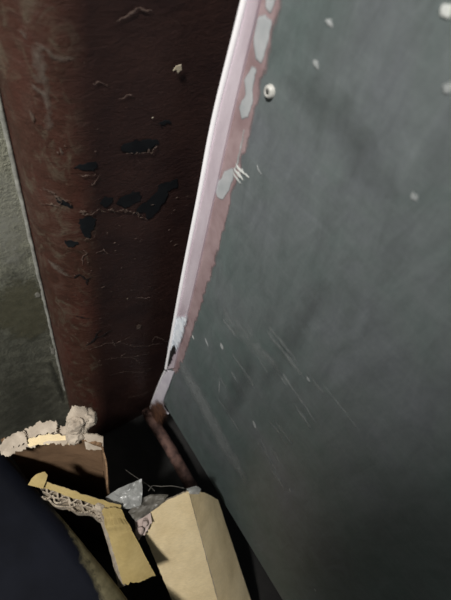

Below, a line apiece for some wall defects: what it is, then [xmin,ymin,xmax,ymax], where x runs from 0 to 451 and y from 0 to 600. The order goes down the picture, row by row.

peeling [239,0,274,119]
peeling [216,134,249,199]
peeling [63,178,178,247]